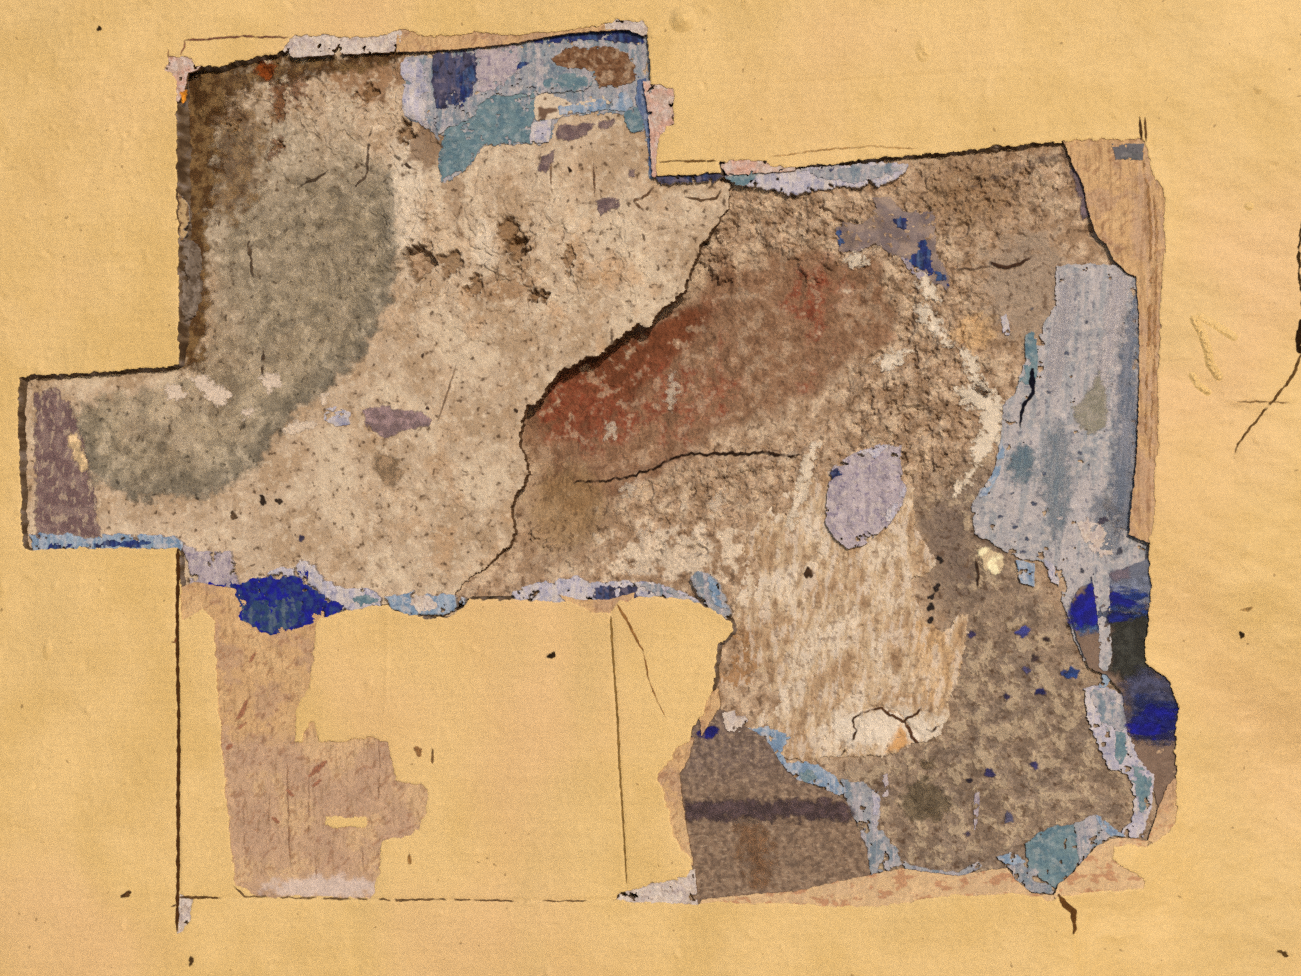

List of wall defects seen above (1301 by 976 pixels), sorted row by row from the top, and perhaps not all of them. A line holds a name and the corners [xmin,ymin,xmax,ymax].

peeling [395,19,675,183]
peeling [1111,143,1144,160]
crack [1235,228,1301,452]
peeling [68,433,88,472]
crack [575,450,801,483]
crack [610,605,664,881]
peeling [722,710,748,732]
crack [843,707,937,753]
peeling [1127,726,1178,808]
spalling [1137,790,1158,841]
peeling [1148,778,1178,846]
crack [1058,894,1077,934]